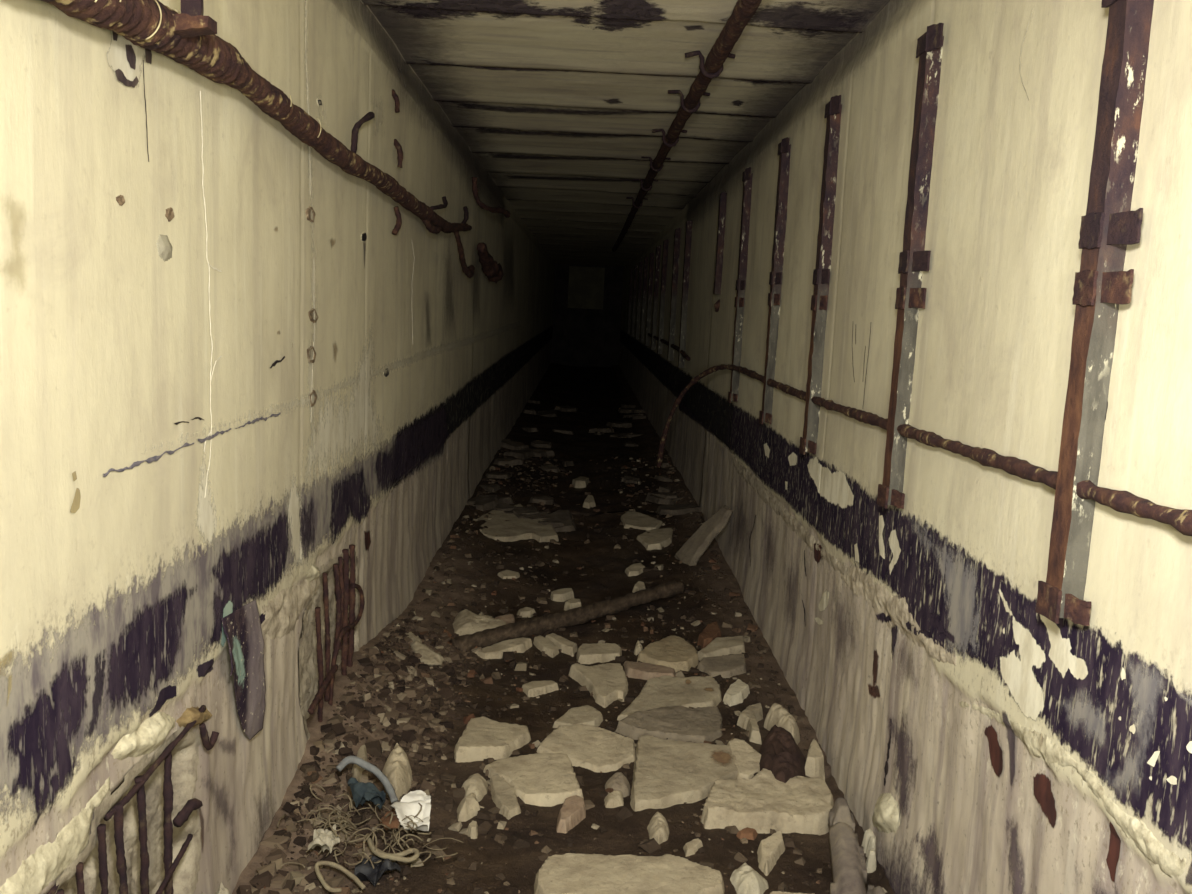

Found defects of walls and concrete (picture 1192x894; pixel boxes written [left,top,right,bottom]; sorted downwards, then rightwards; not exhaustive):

leakage [384,0,666,31]
leakage [746,2,848,38]
leakage [191,322,520,565]
leakage [915,522,982,660]
spalling [44,705,219,894]
leakage [889,717,913,819]
rust [984,725,1003,777]
leakage [1002,713,1015,785]
rust [1033,773,1057,828]
leakage [876,829,944,894]
leakage [1007,821,1024,894]
rust [1106,822,1121,882]